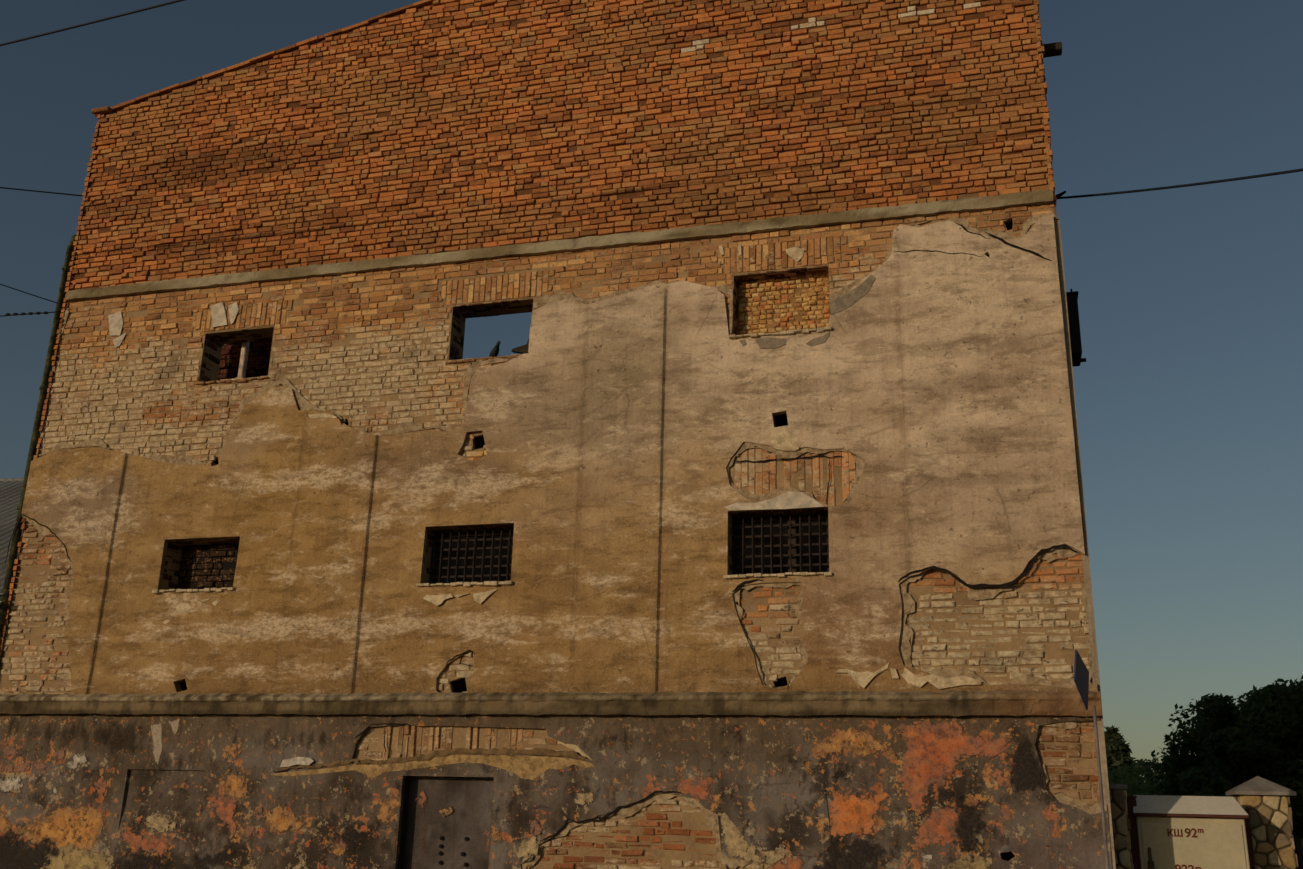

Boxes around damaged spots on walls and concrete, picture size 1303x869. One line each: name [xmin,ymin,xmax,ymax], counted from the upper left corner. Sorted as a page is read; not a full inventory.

crack [892,223,1052,261]
spalling [37,202,1058,465]
spalling [726,442,865,507]
spalling [835,547,1098,689]
damp [151,720,179,764]
peeling [265,725,595,780]
damp [1010,741,1046,791]
damp [0,833,59,869]
damp [332,823,365,855]
crack [540,790,683,842]
spalling [483,777,803,869]
mould [929,790,987,851]